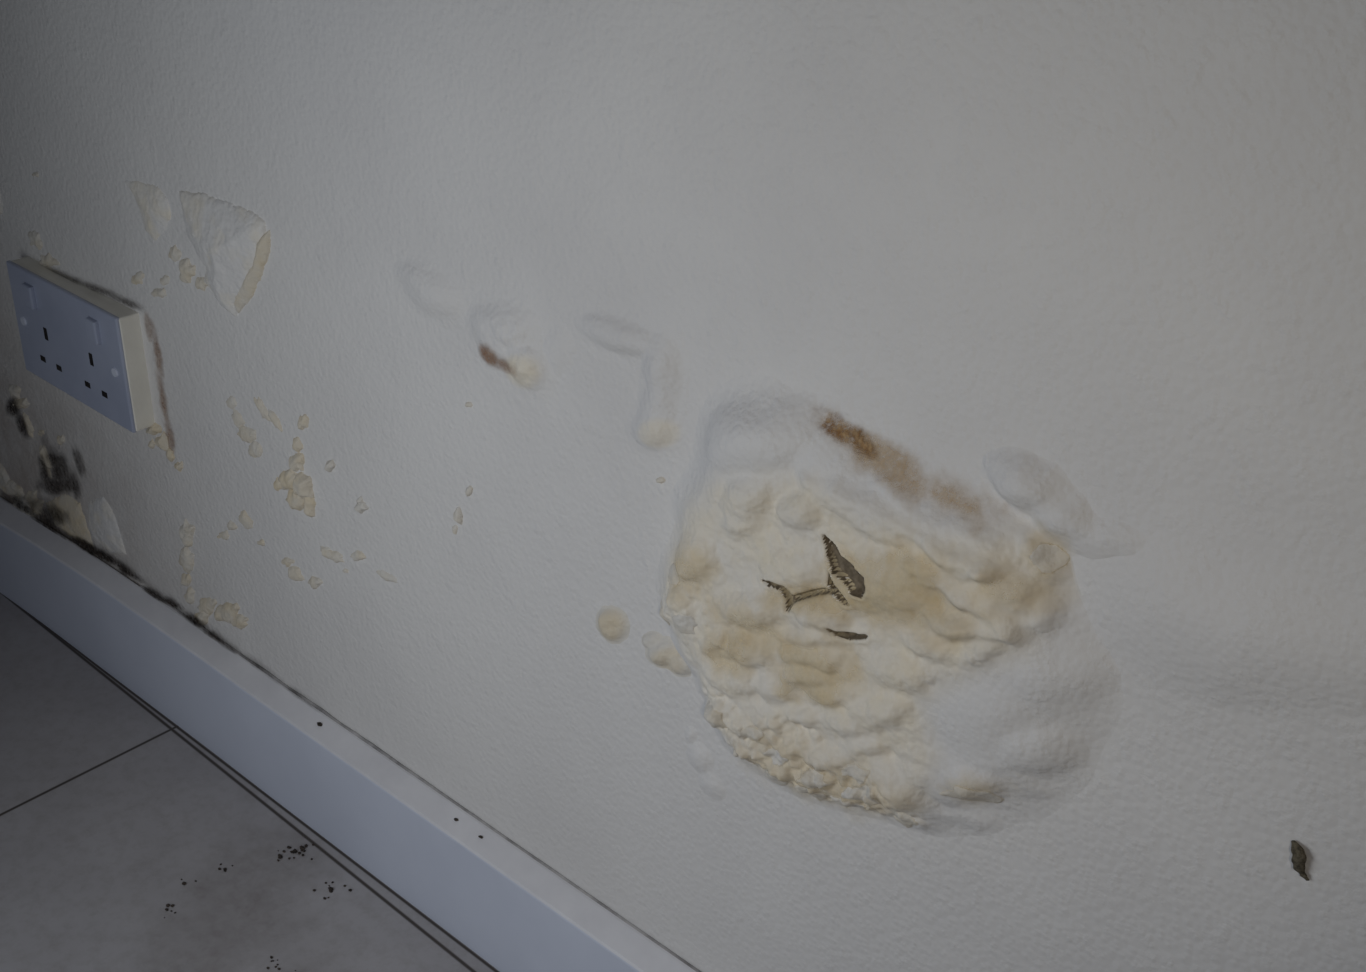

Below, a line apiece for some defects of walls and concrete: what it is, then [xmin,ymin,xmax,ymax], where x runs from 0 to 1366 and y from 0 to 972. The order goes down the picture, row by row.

water stain [6,400,27,436]
peeling [273,414,336,517]
water stain [3,451,234,652]
crack [762,535,867,640]